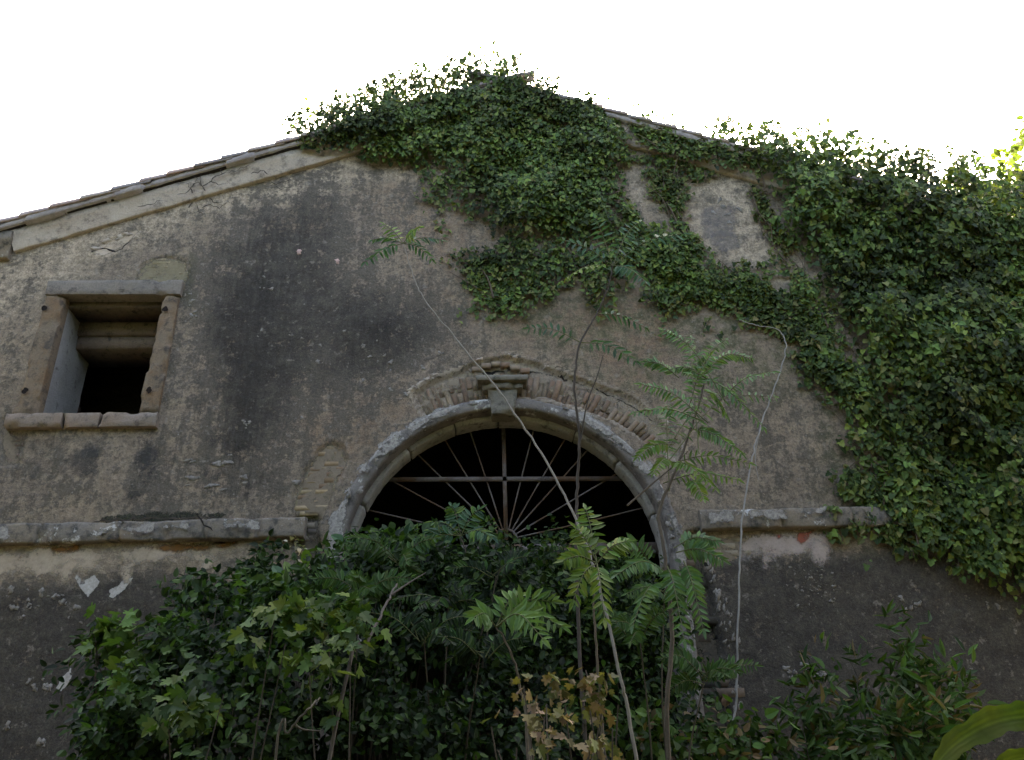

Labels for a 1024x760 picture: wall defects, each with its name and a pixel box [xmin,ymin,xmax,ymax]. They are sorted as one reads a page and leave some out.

crack [138,159,315,214]
spalling [292,353,751,751]
flaking render [8,575,132,624]